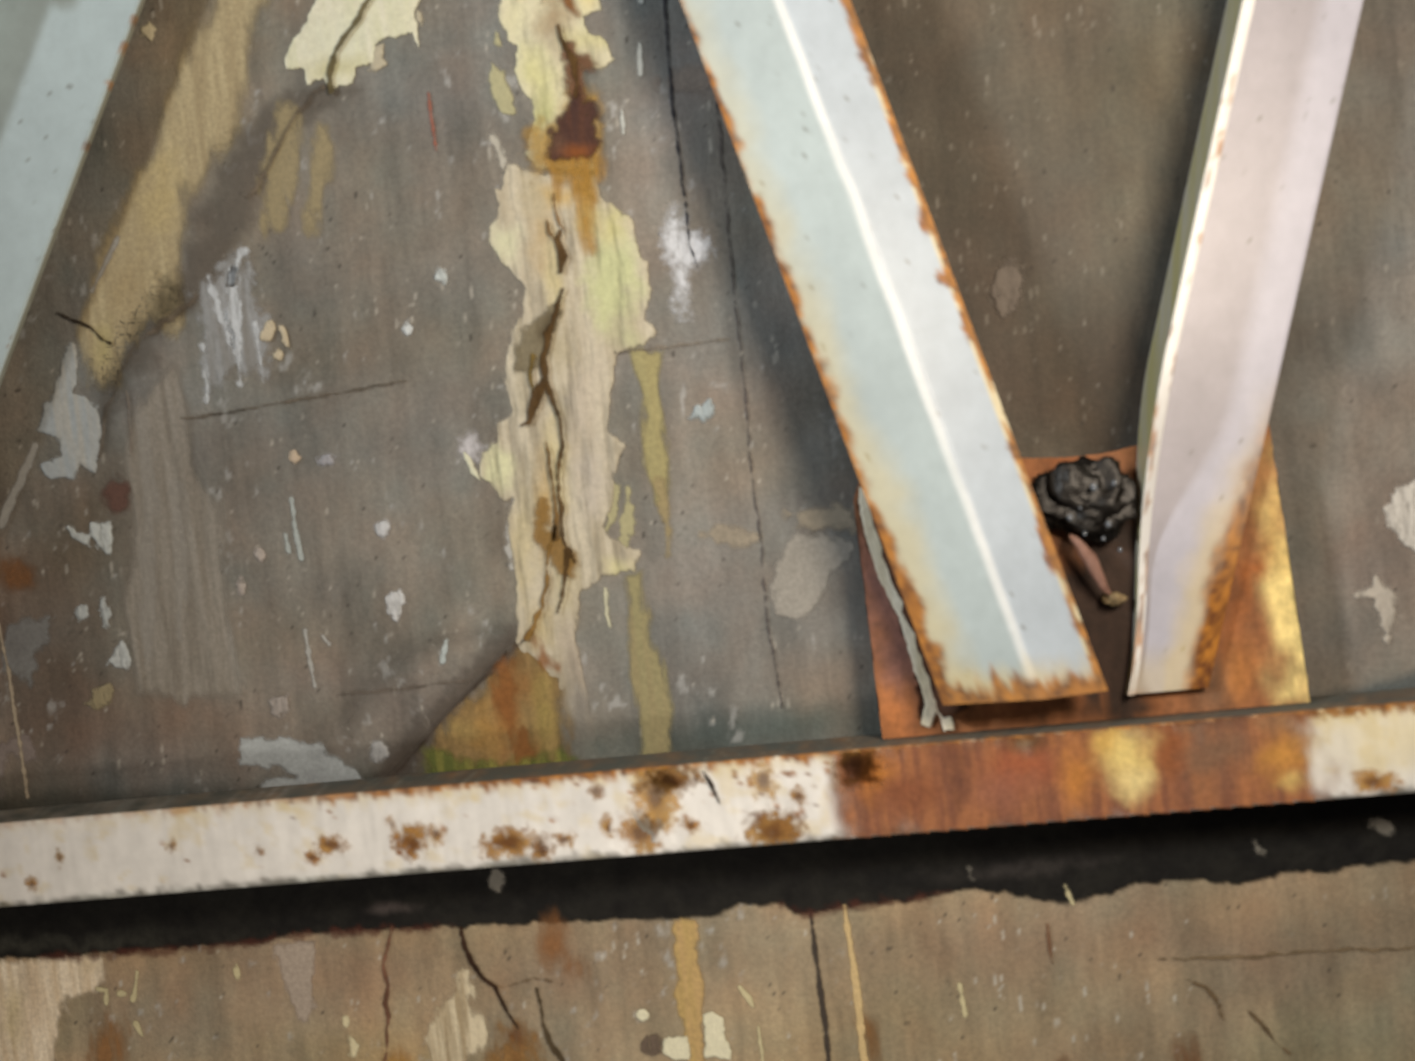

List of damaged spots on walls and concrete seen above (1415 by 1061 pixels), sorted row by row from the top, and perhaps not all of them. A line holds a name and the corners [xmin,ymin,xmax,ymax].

peeling [285,0,423,88]
crack [557,24,578,98]
leakage [79,0,335,411]
corrosion [531,41,600,250]
crack [663,0,694,257]
peeling [463,0,656,709]
crack [343,193,576,776]
peeling [1384,480,1415,550]
corrosion [427,640,570,767]
corrosion [834,713,1315,837]
corrosion [481,827,572,859]
crack [459,927,565,1061]